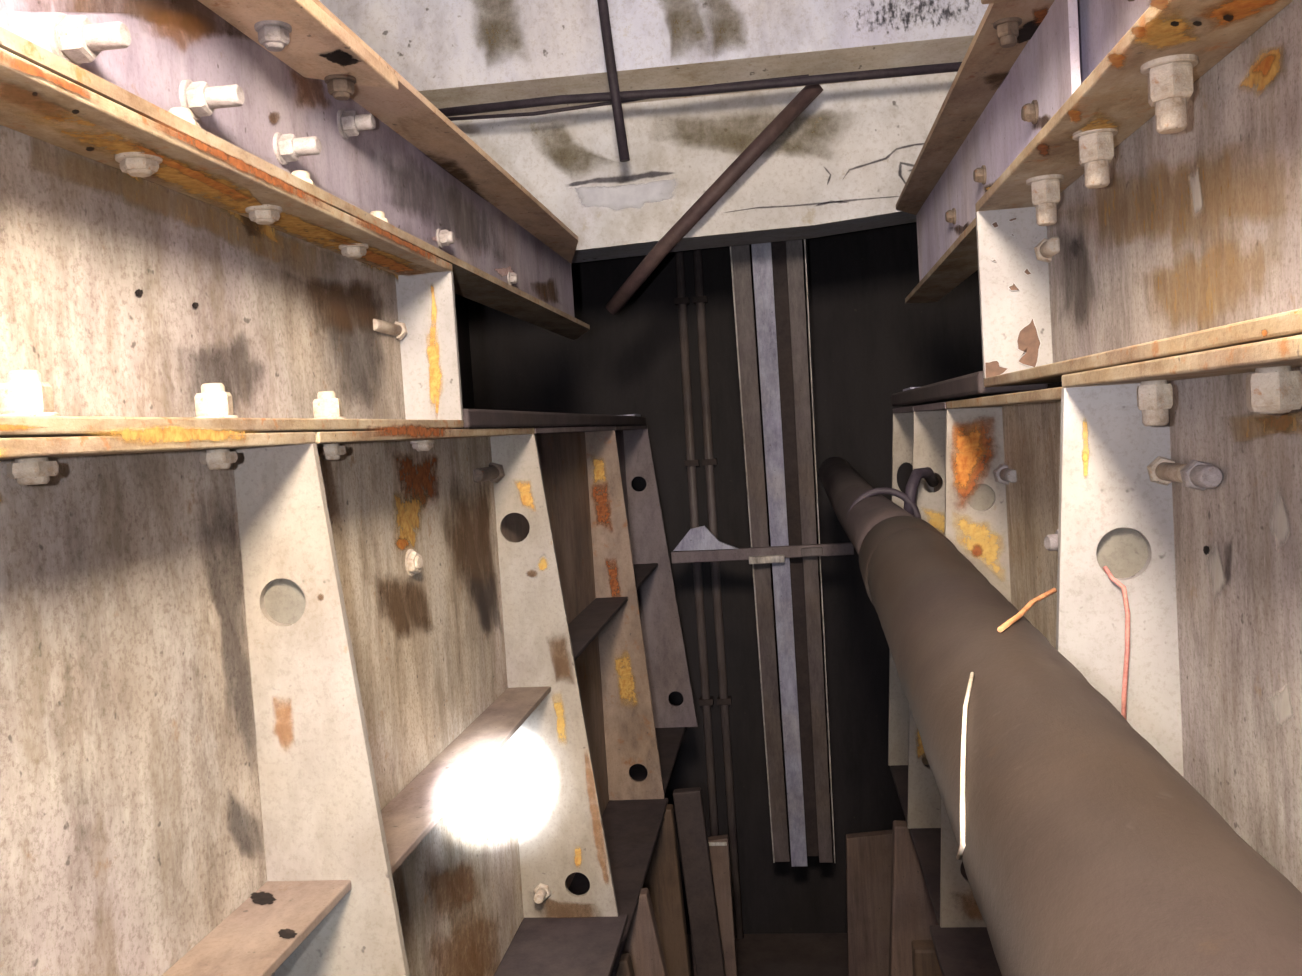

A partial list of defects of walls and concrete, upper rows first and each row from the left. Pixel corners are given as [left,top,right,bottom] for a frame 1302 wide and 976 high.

rust [67,0,248,49]
damp [480,0,520,59]
damp [666,0,741,51]
damp [859,0,969,31]
rust [1131,0,1278,49]
damp [677,113,834,153]
damp [548,127,673,210]
crack [730,143,924,212]
rust [1083,153,1268,245]
rust [0,49,450,438]
rust [394,455,439,550]
rust [925,419,1001,575]